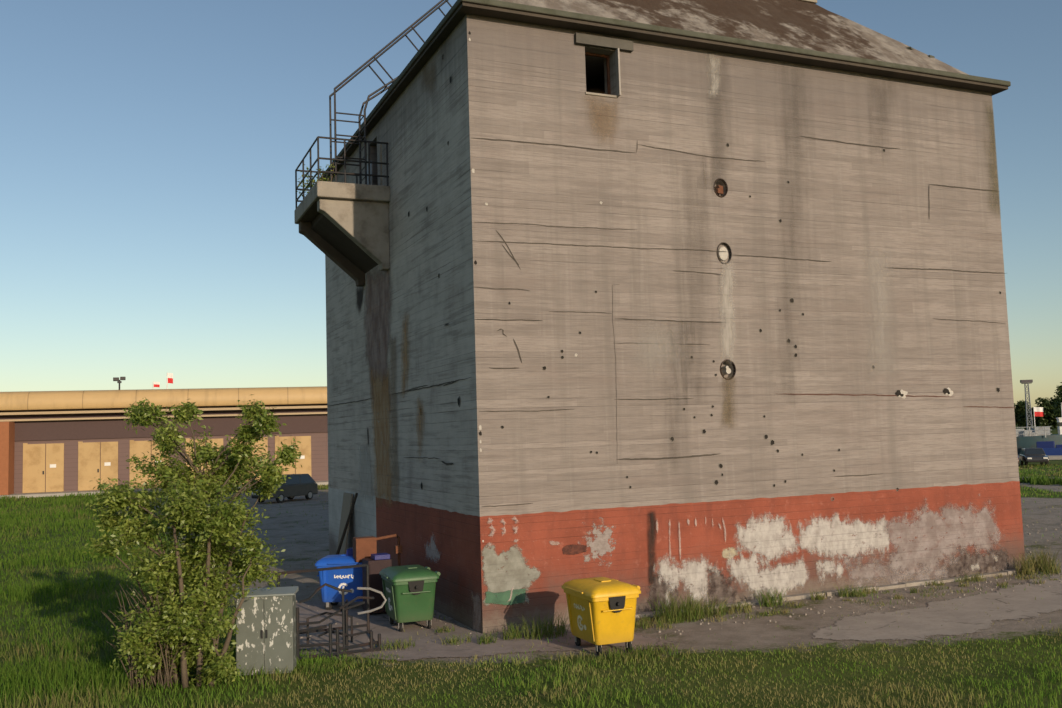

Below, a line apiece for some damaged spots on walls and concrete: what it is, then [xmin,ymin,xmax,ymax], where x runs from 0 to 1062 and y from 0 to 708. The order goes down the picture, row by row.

leakage [722,267,733,355]
corrosion [365,270,391,502]
peeling [472,540,540,633]
peeling [549,518,616,566]
peeling [645,505,1009,612]